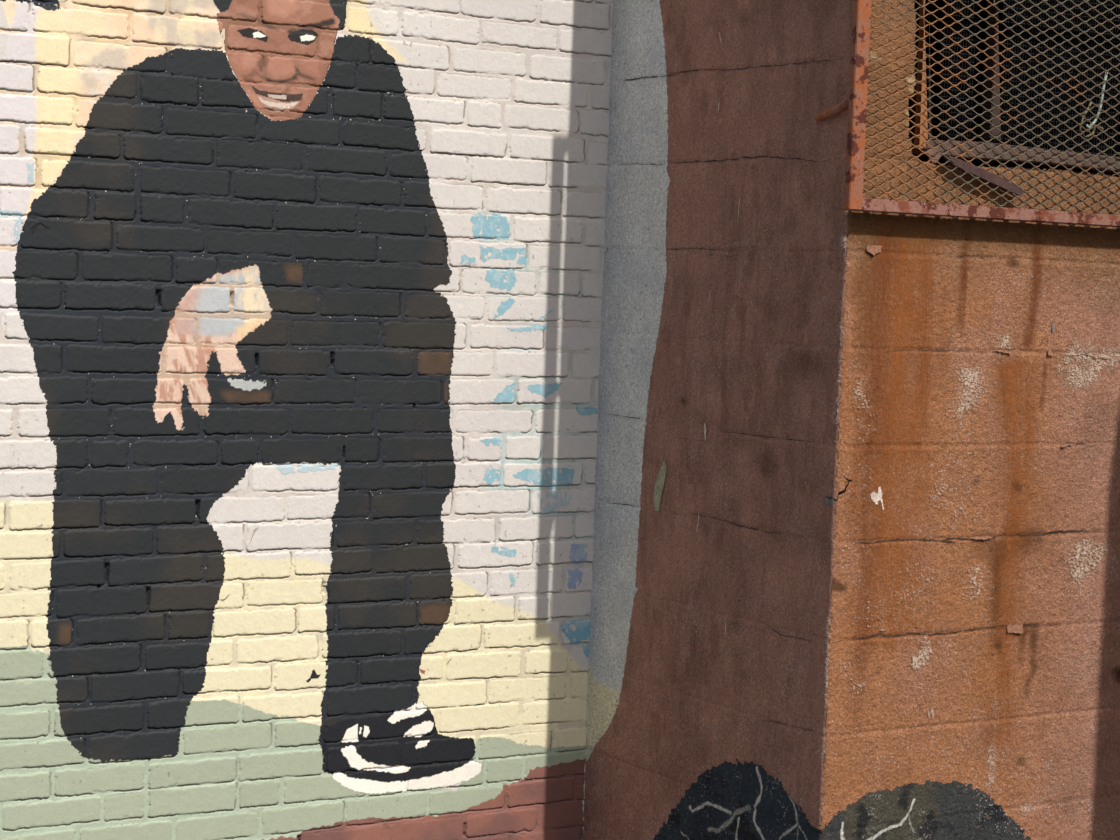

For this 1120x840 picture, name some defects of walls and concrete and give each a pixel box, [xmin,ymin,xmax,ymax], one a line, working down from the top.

crack [627,59,838,81]
crack [838,530,1100,550]
crack [772,623,1031,642]